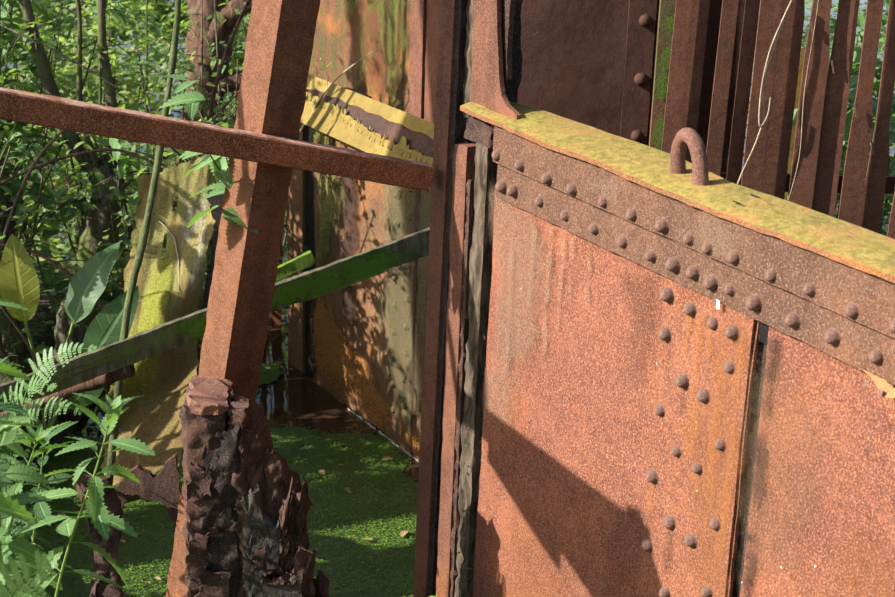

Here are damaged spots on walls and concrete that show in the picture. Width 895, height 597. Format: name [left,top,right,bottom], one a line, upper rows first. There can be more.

peeling [306,90,434,166]
leakage [181,201,206,289]
rust [312,297,391,429]
rust [406,433,420,461]